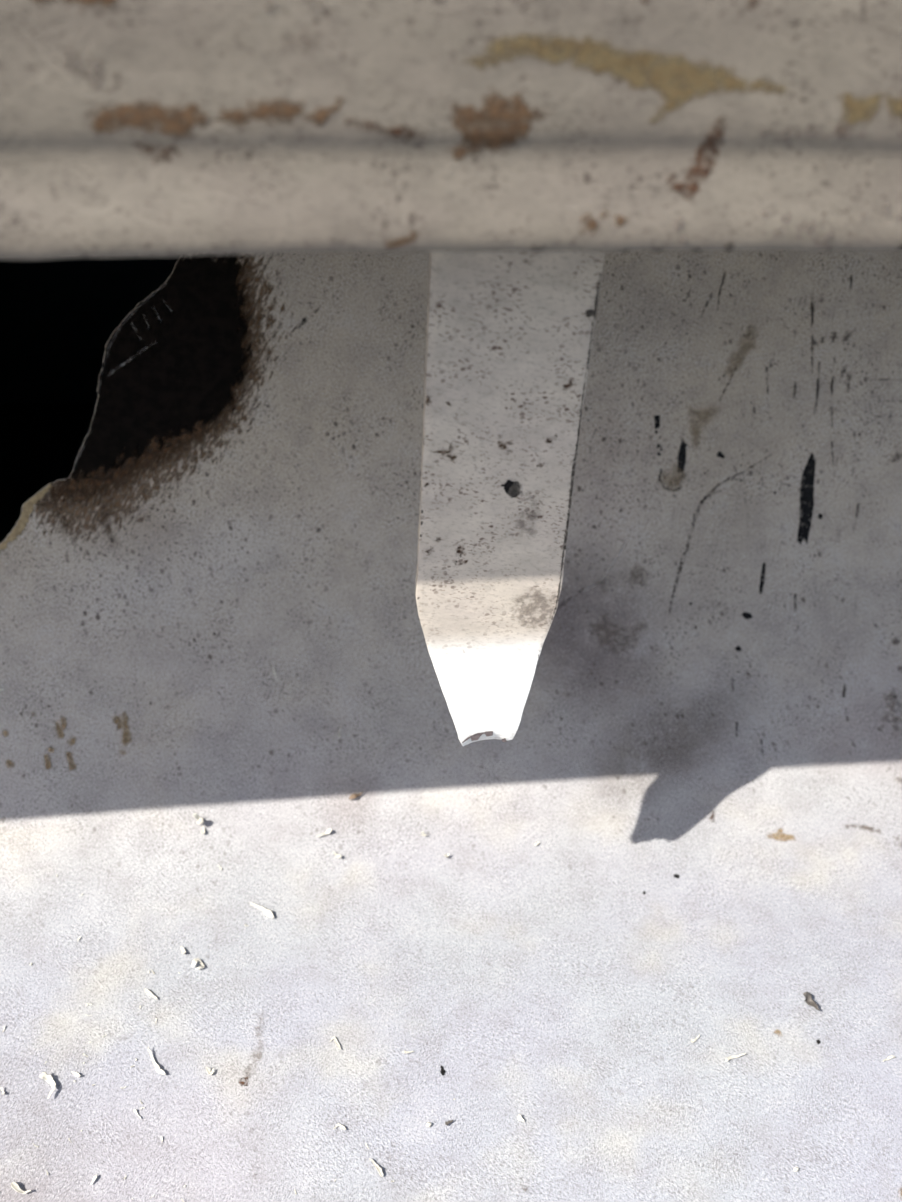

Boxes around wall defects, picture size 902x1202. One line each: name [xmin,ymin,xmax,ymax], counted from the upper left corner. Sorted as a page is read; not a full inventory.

corrosion [87,98,424,161]
corrosion [452,89,542,161]
corrosion [667,117,726,199]
crack [669,456,770,612]